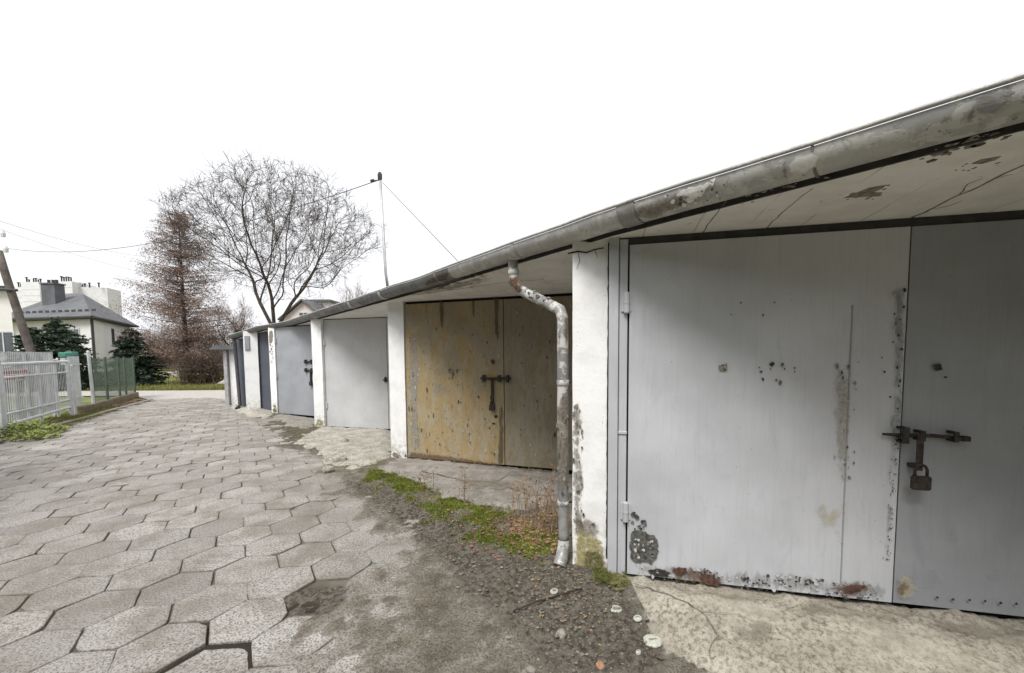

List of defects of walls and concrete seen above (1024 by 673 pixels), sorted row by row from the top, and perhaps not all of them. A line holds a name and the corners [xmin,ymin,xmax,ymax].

peeling [919,132,1012,171]
peeling [664,177,725,210]
peeling [844,185,890,200]
crack [911,165,1024,218]
peeling [524,387,585,527]
damp [573,519,597,536]
peeling [629,511,882,602]
corrosion [672,567,721,586]
corrosion [827,582,872,598]